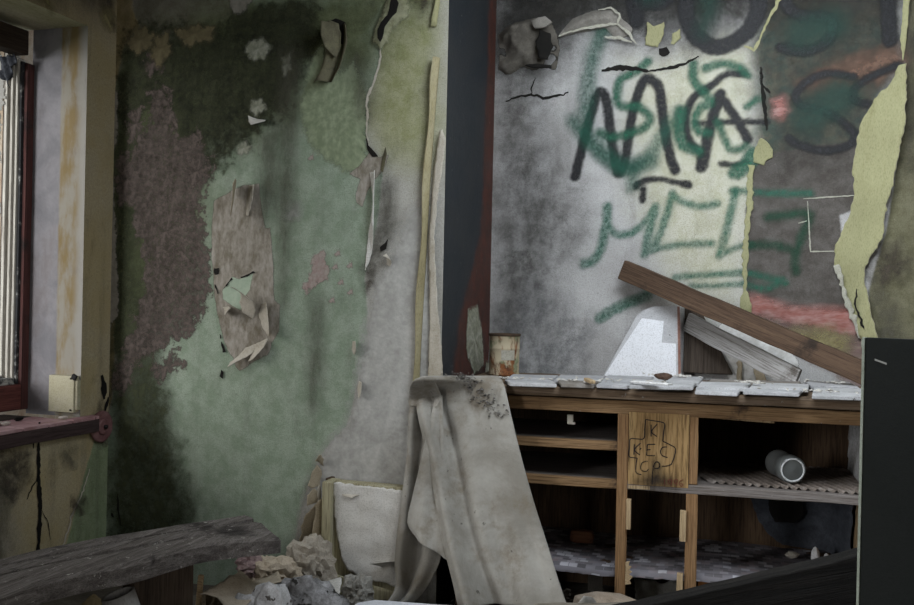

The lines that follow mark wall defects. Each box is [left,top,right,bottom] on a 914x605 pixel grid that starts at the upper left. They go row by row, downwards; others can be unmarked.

spalling [99,22,280,411]
leakage [101,0,322,536]
peeling [300,18,392,270]
crack [506,78,568,102]
crack [602,56,699,73]
peeling [834,0,910,347]
crack [27,422,90,550]
peeling [299,485,321,542]